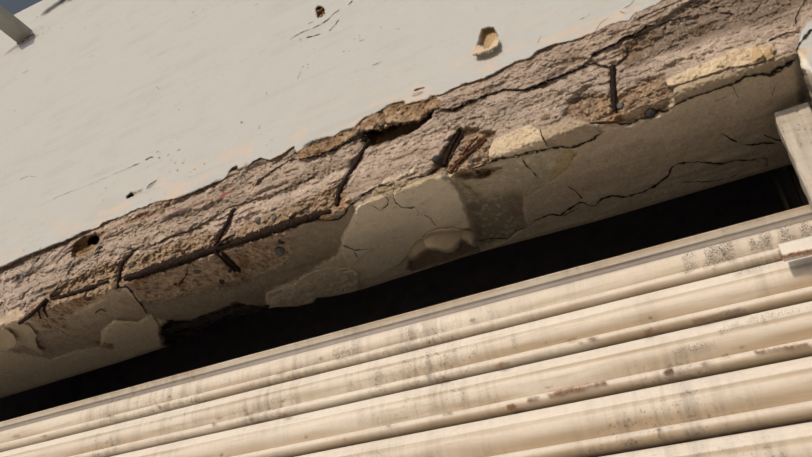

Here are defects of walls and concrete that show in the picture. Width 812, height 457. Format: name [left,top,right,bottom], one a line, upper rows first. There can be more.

spalling [427,44,797,176]
crack [441,0,812,177]
crack [112,121,417,257]
spalling [0,0,692,360]
crack [318,167,441,226]
crack [479,134,781,241]